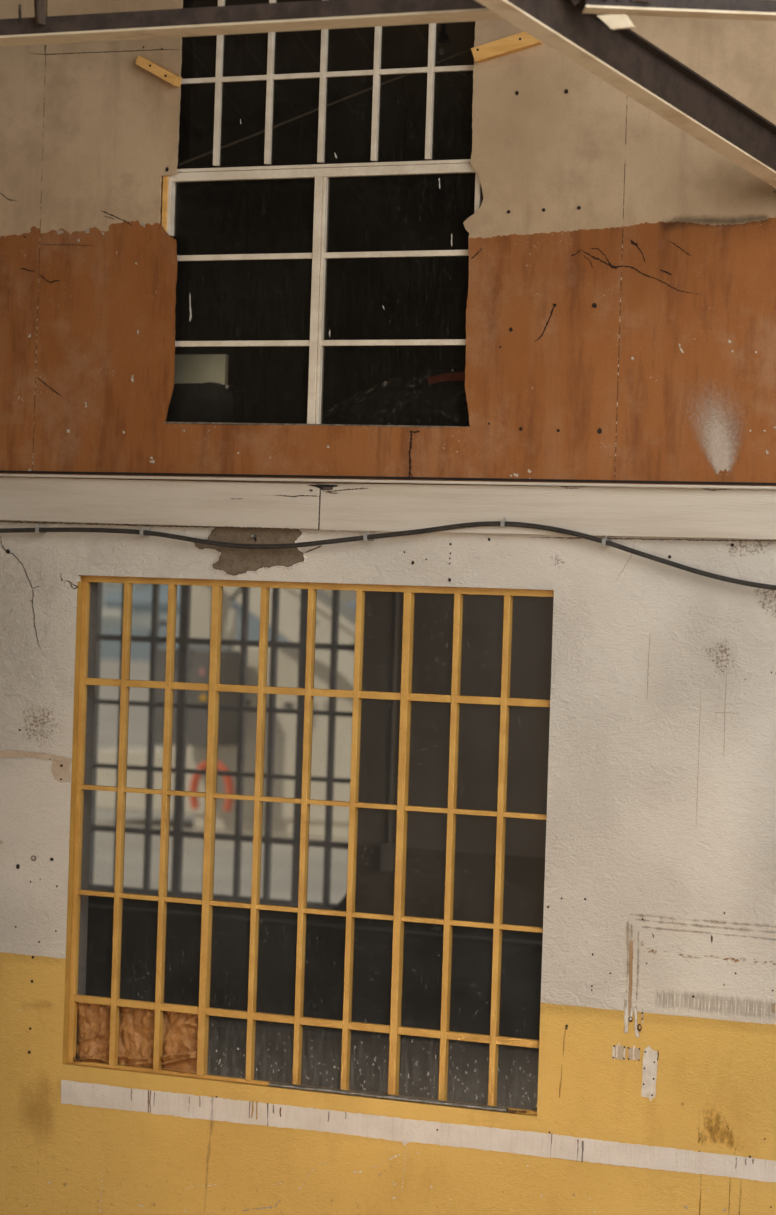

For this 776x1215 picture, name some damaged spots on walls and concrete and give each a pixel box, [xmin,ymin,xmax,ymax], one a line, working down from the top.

crack [571,239,700,295]
spalling [191,527,321,579]
crack [0,536,41,649]